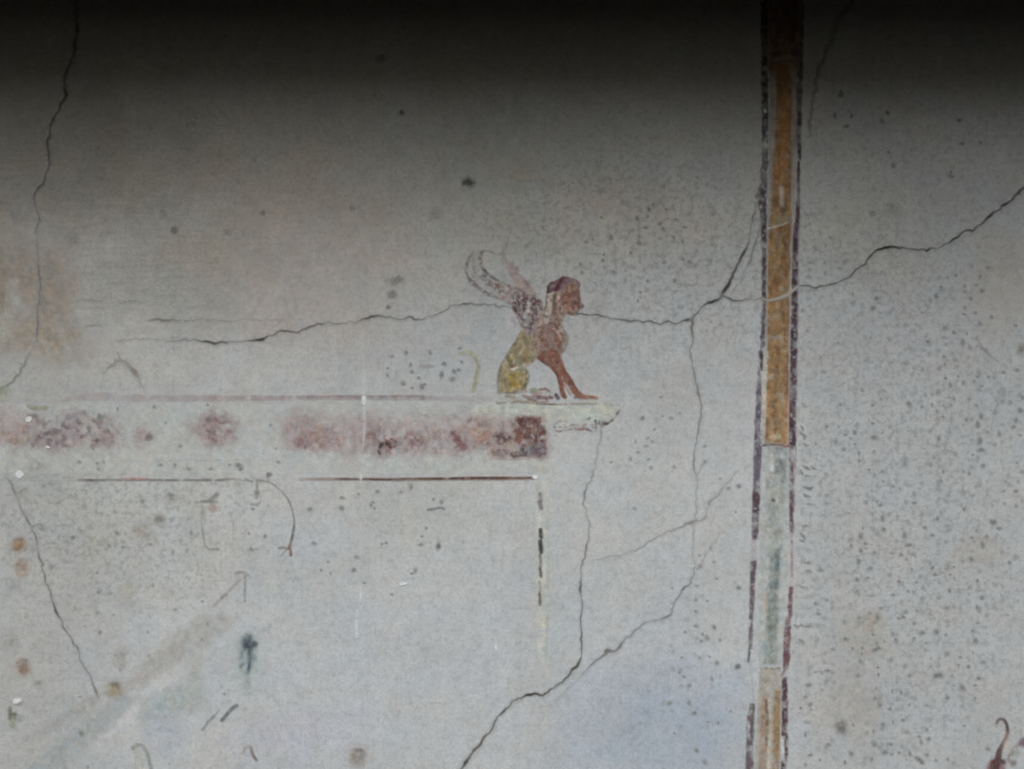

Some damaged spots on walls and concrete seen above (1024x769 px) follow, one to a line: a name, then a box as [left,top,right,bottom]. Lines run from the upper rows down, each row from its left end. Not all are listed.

crack [33,0,79,228]
crack [0,266,41,390]
crack [182,302,504,345]
crack [576,186,1024,470]
crack [7,478,98,698]
crack [460,540,701,769]
crack [636,497,716,550]